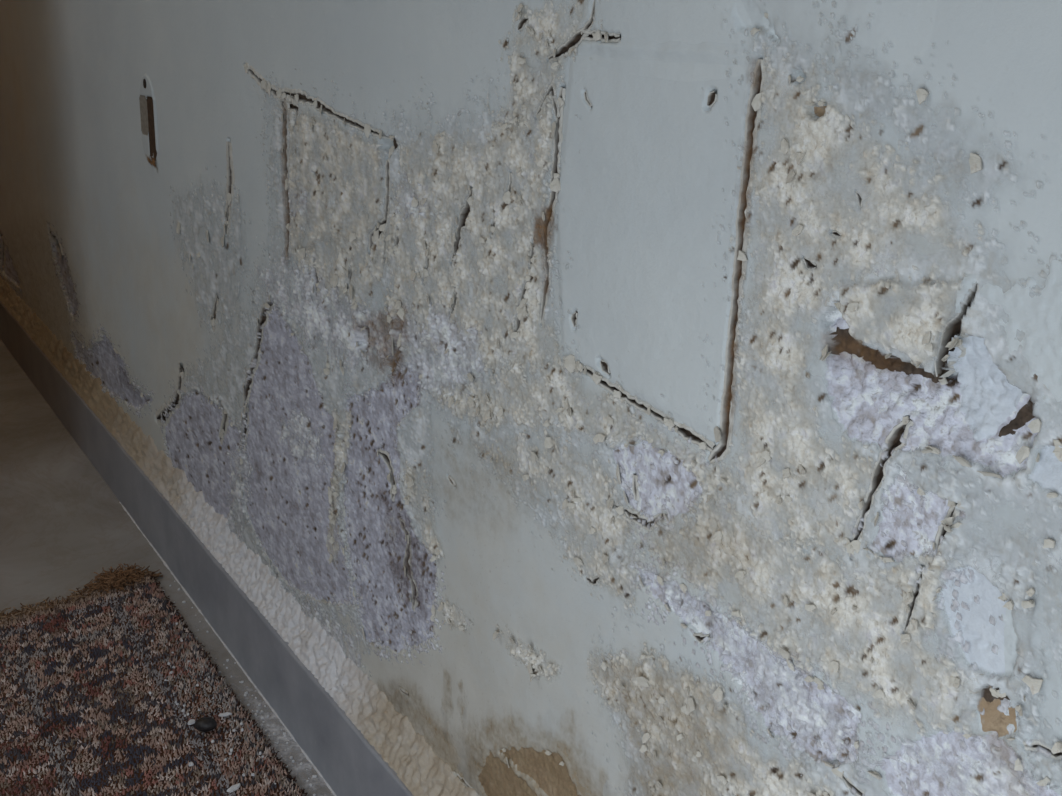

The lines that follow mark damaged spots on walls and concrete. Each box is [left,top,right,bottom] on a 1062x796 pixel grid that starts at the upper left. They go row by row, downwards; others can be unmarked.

peeling [707,91,717,108]
spalling [805,101,826,117]
crack [243,62,401,302]
crack [449,291,457,314]
crack [423,173,515,283]
crack [511,0,621,338]
crack [562,59,767,465]
peeling [803,256,817,271]
crack [934,283,979,377]
crack [844,415,914,558]
spalling [611,302,1062,796]
peeling [478,747,579,796]